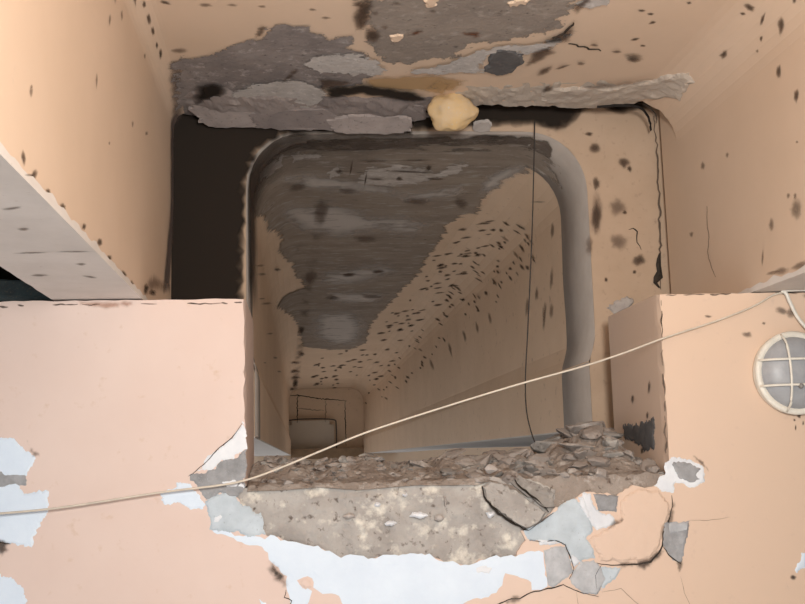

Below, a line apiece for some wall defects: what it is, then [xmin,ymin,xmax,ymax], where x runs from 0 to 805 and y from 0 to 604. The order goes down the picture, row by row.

water stain [354,0,379,41]
water stain [469,104,588,129]
peeling [455,65,695,108]
water stain [607,101,651,112]
water stain [165,70,439,300]
peeling [170,0,610,350]
crack [597,104,663,289]
water stain [423,221,535,325]
peeling [0,437,49,553]
spalling [160,421,622,604]
peeling [622,413,705,493]
crack [499,584,638,604]